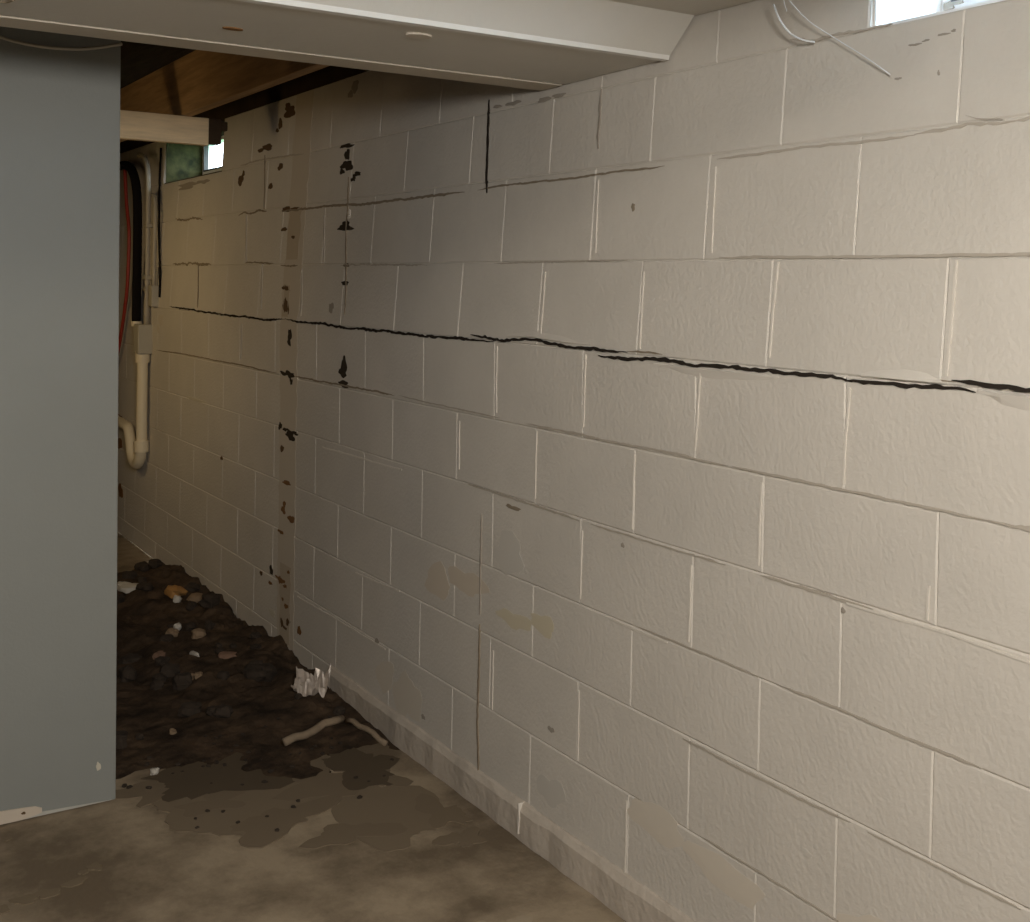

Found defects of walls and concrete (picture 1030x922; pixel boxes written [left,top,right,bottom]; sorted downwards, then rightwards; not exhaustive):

crack [158,350,498,418]
crack [169,89,1030,393]